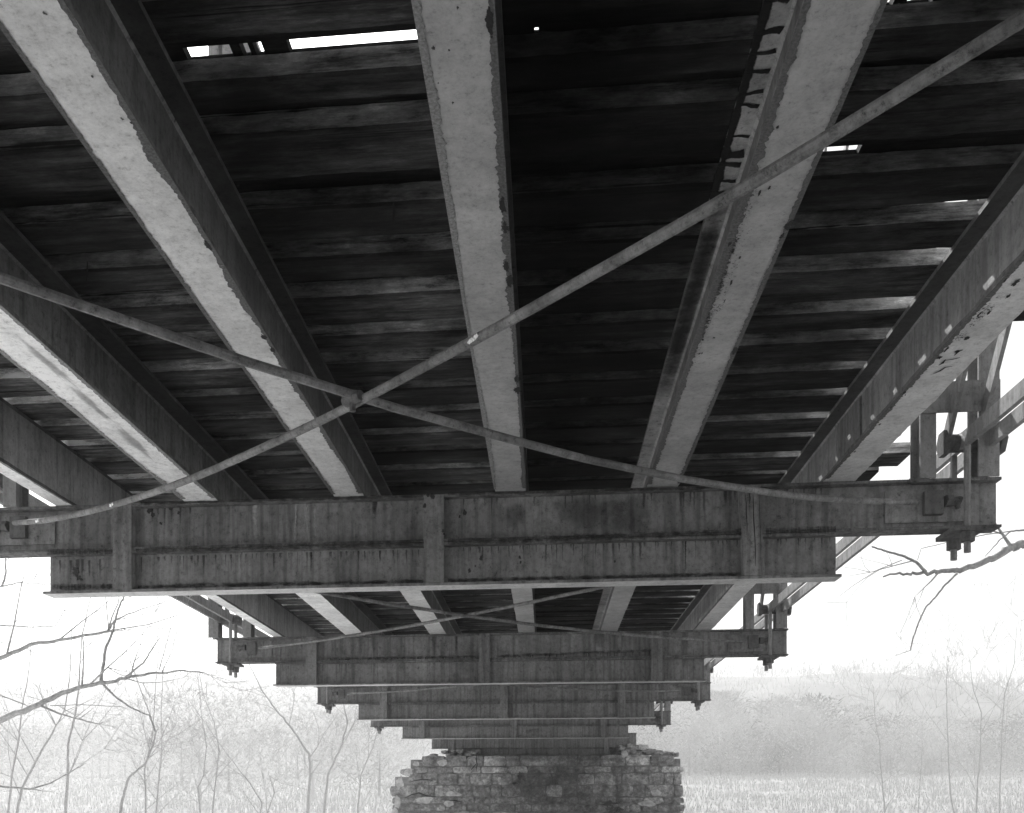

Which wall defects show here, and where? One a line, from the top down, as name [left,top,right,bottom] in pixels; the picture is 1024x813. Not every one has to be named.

peeling [747,0,811,178]
peeling [485,0,526,488]
peeling [647,186,771,484]
peeling [826,254,1024,479]